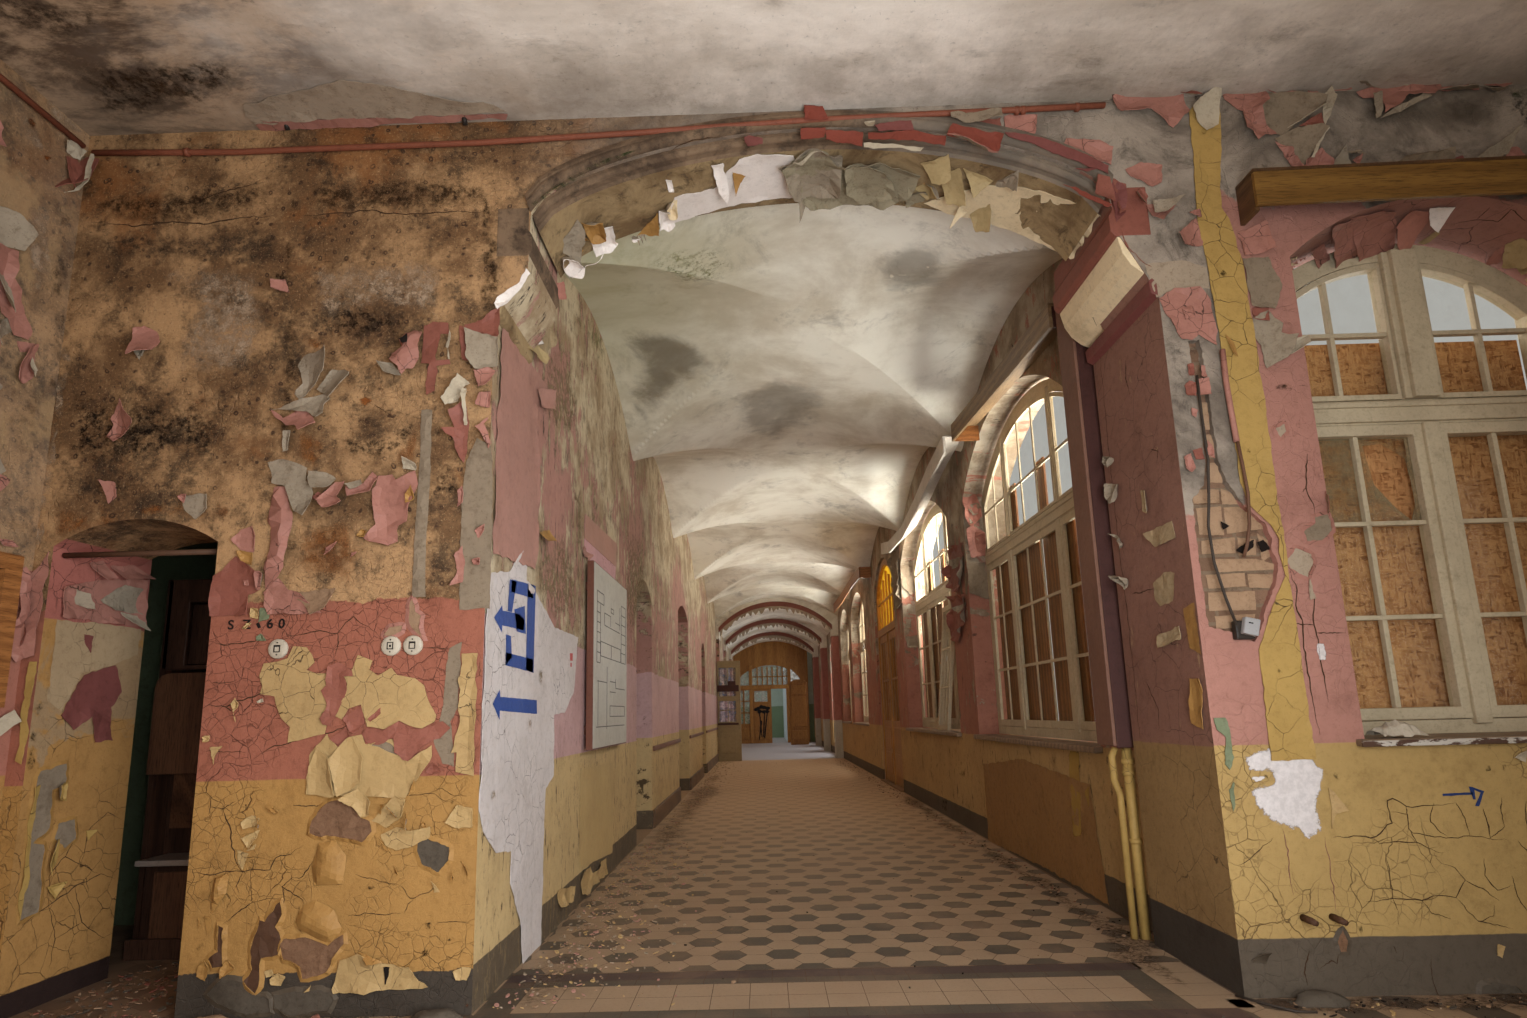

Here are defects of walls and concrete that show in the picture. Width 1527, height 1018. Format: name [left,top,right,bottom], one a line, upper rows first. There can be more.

water stain [101,65,225,109]
water stain [100,193,289,257]
water stain [315,183,489,226]
water stain [323,267,433,334]
water stain [74,399,210,456]
spalling [557,105,1336,654]
peeling [208,345,418,641]
peeling [0,552,156,926]
peeling [257,642,478,893]
crack [1243,831,1293,891]
crack [1325,798,1527,953]
peeling [196,897,427,1018]